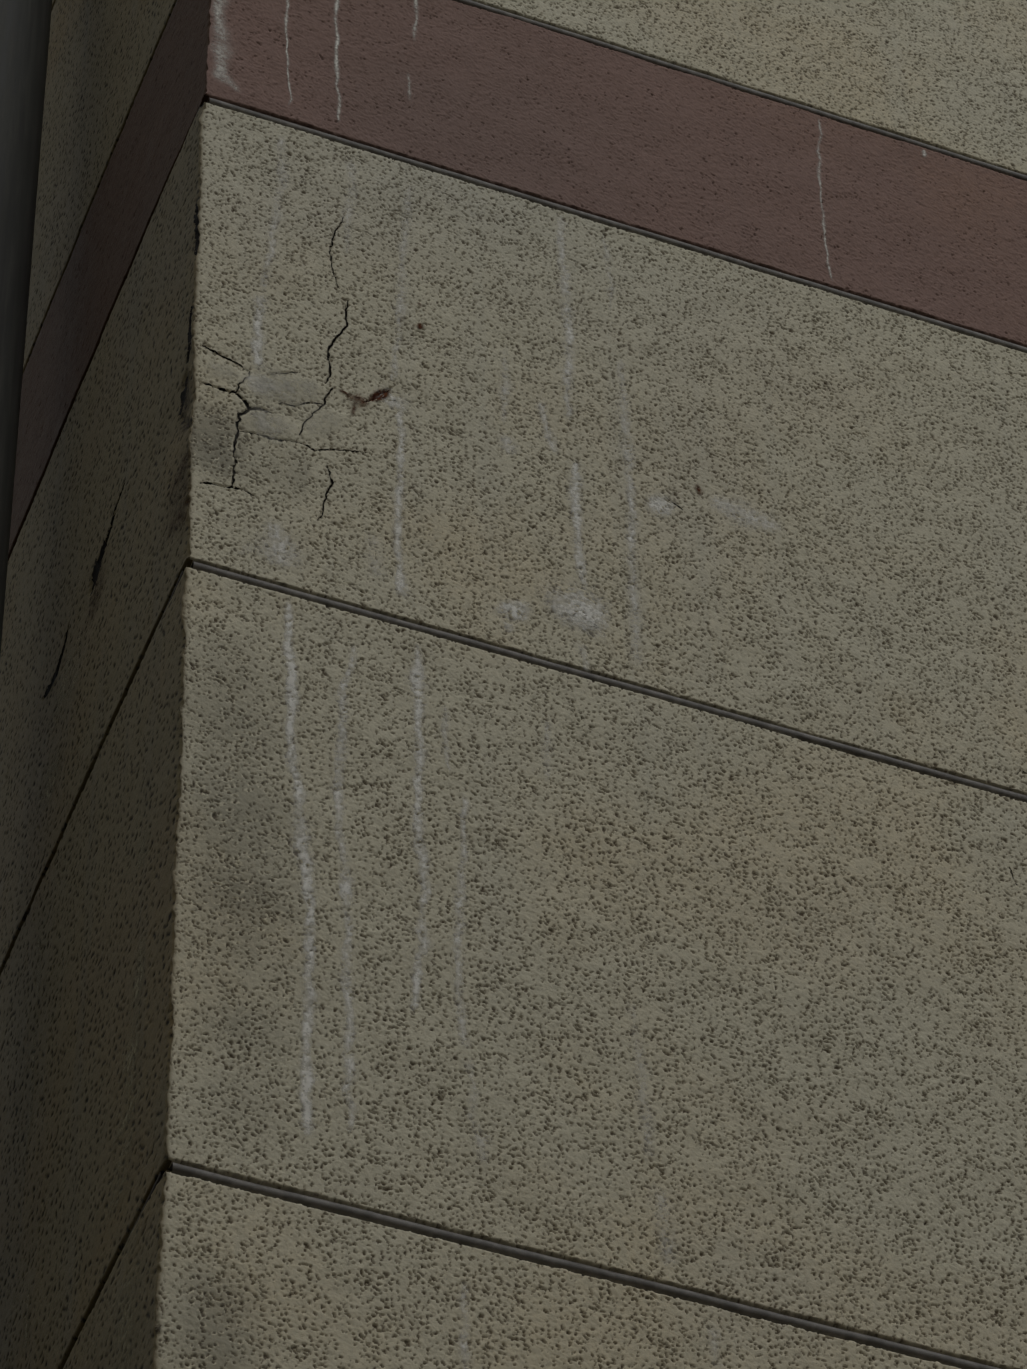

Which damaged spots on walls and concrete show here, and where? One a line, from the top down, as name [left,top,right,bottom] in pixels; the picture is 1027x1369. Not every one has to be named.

crack [192,203,200,259]
crack [179,217,359,520]
crack [44,623,70,699]
leakage [283,603,316,1134]
leakage [334,649,355,1125]
leakage [410,650,431,1008]